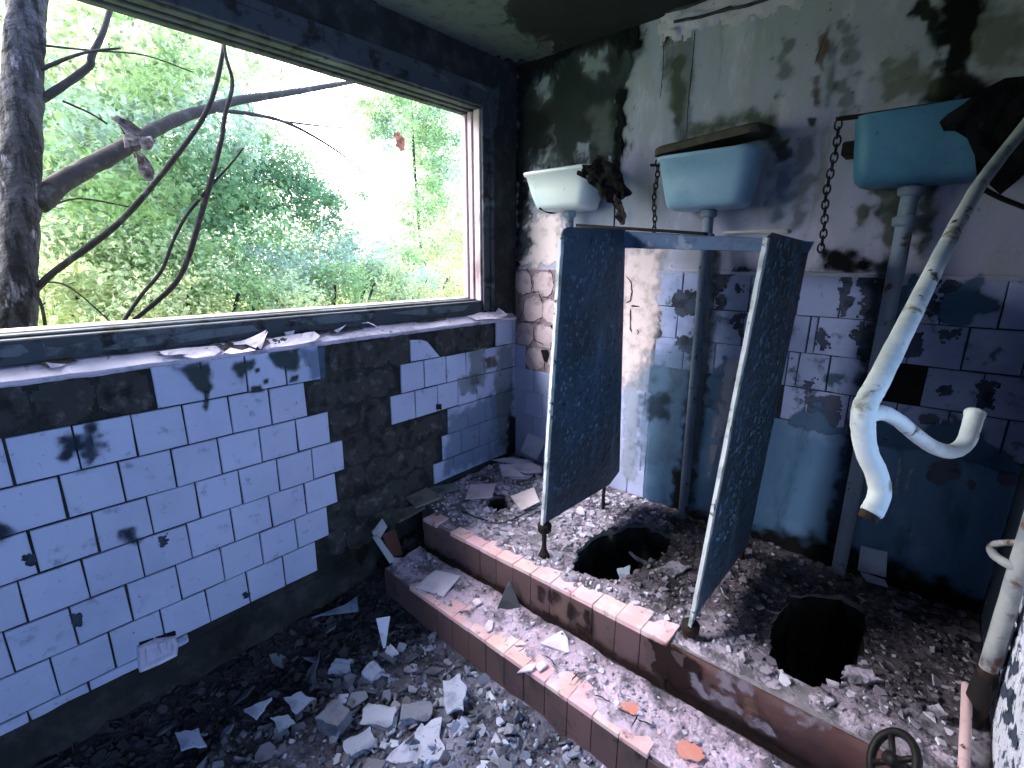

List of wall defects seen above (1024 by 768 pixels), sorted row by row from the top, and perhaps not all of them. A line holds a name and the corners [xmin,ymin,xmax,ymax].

peeling [371,0,555,63]
water stain [881,0,1024,103]
water stain [516,25,643,268]
water stain [856,189,900,261]
spalling [0,371,154,438]
water stain [58,422,106,464]
spalling [36,313,443,556]
peeling [394,213,697,538]
water stain [646,393,670,420]
water stain [670,250,738,509]
peeling [21,553,37,567]
spalling [643,638,775,736]